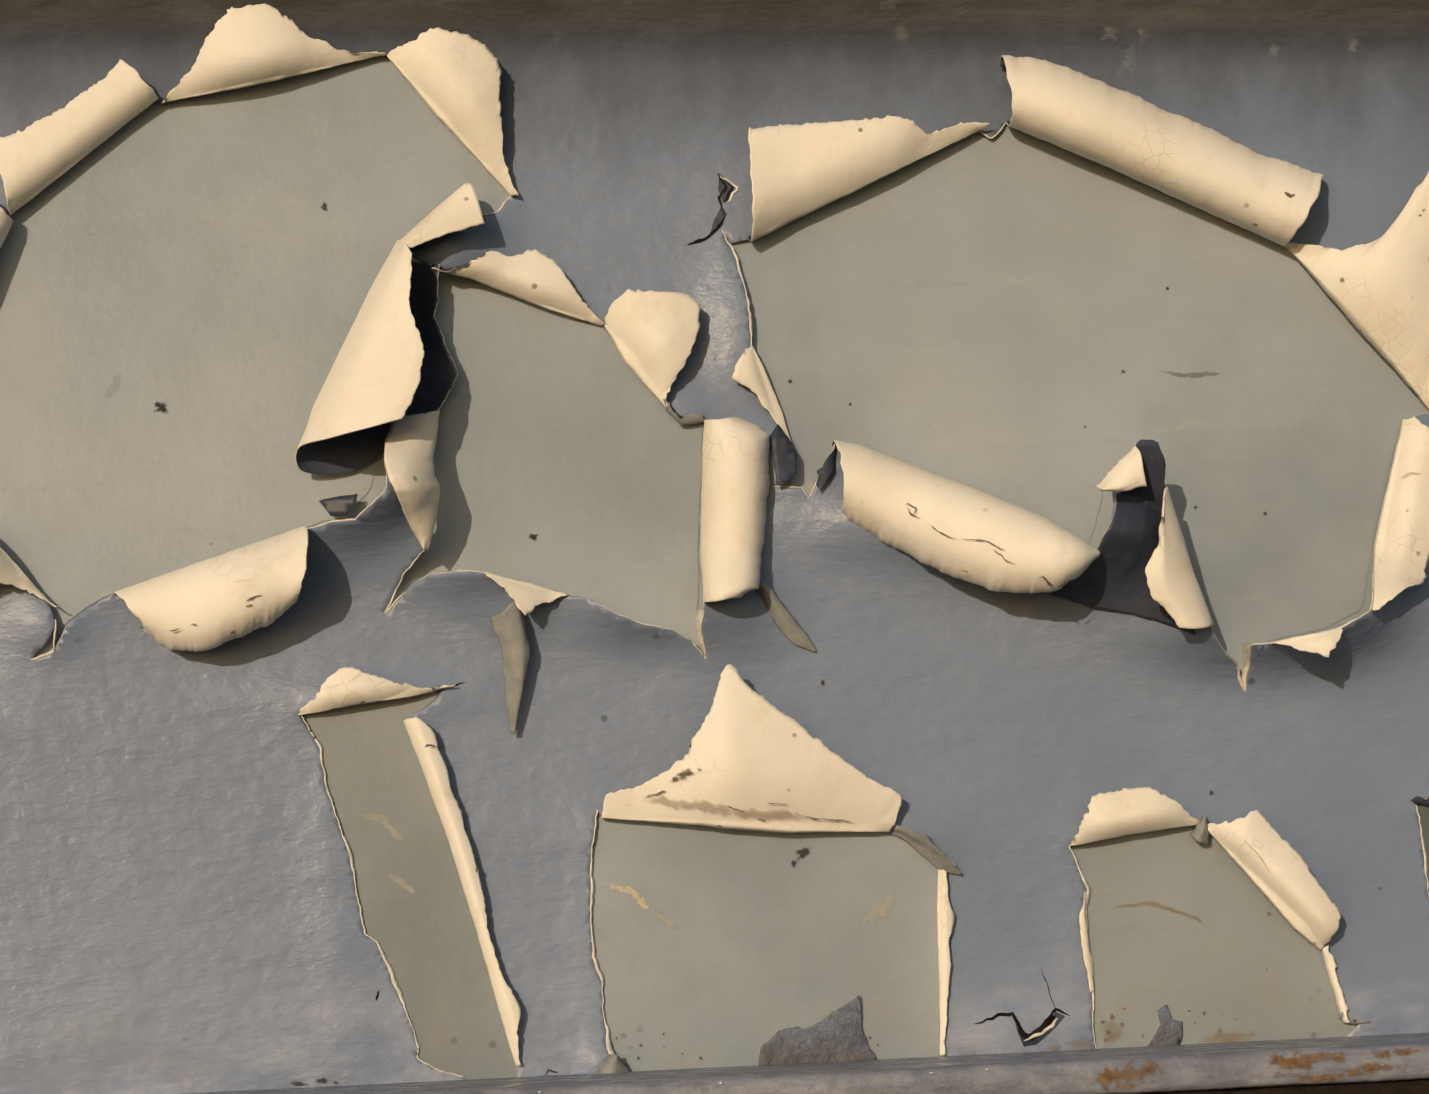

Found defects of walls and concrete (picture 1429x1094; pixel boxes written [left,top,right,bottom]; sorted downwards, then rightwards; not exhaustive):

peeling [0,3,1429,734]
peeling [298,667,521,1080]
peeling [590,664,962,1074]
crack [975,968,1070,1047]
peeling [1069,787,1371,1049]
corrosion [1097,1048,1429,1094]
peeling [1410,796,1429,895]